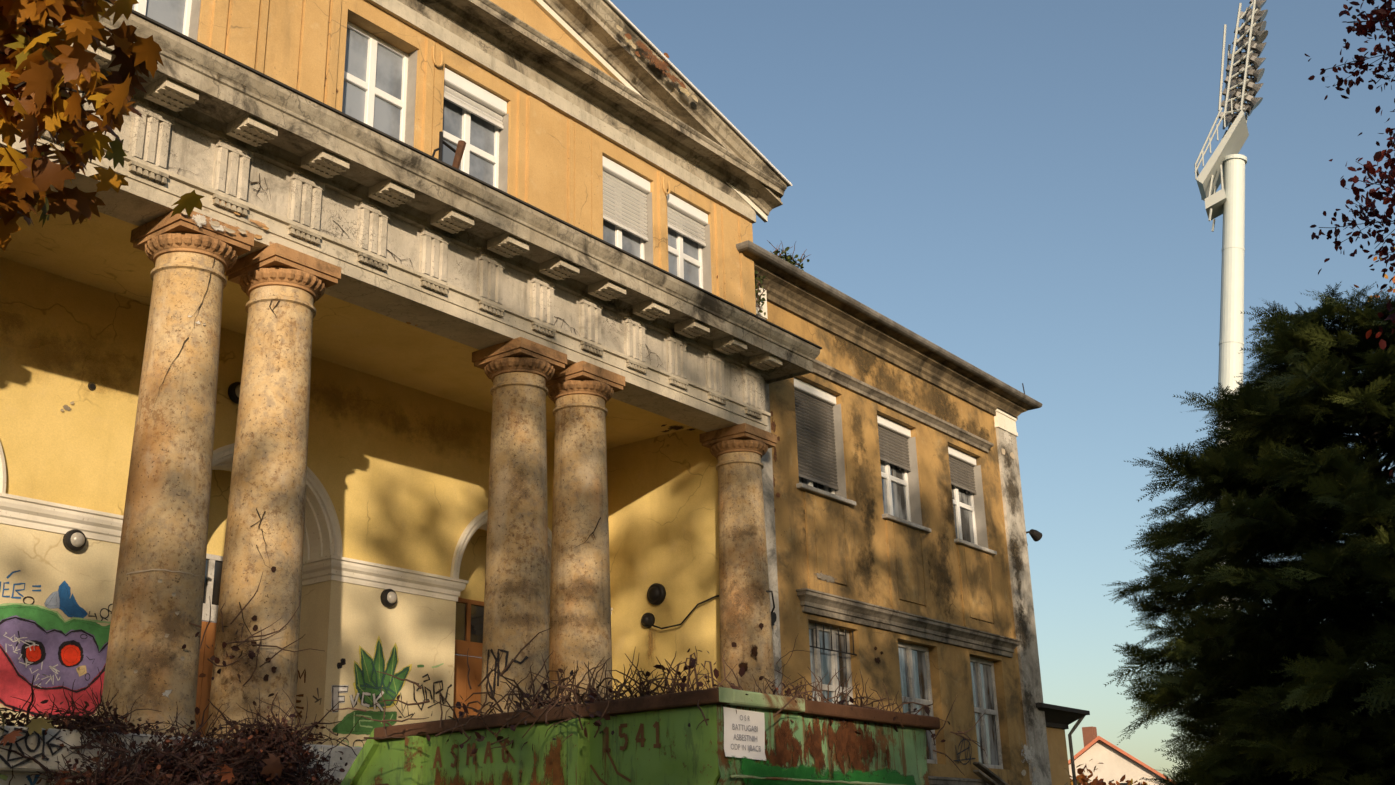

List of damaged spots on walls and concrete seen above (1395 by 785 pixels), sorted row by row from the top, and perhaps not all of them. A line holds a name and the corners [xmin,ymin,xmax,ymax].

spalling [616,25,698,102]